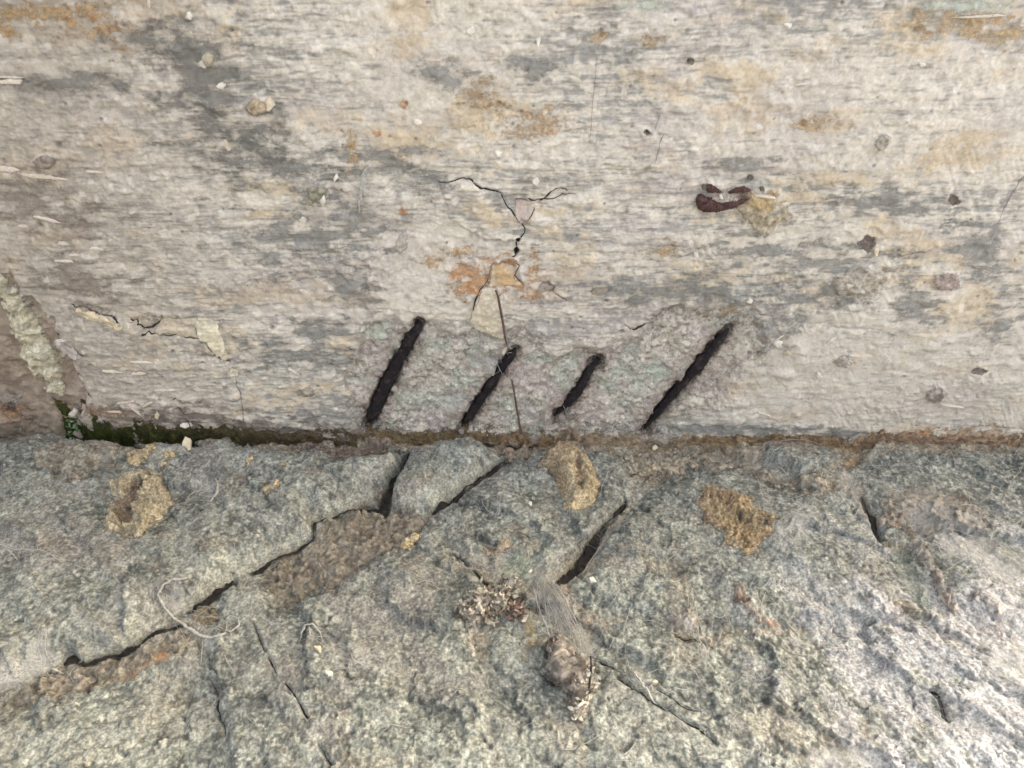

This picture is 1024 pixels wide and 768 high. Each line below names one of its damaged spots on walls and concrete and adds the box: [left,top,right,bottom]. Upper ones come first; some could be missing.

crack [438,177,573,311]
peeling [55,341,78,360]
spalling [344,238,791,451]
crack [64,451,410,666]
crack [434,443,533,513]
crack [555,501,626,586]